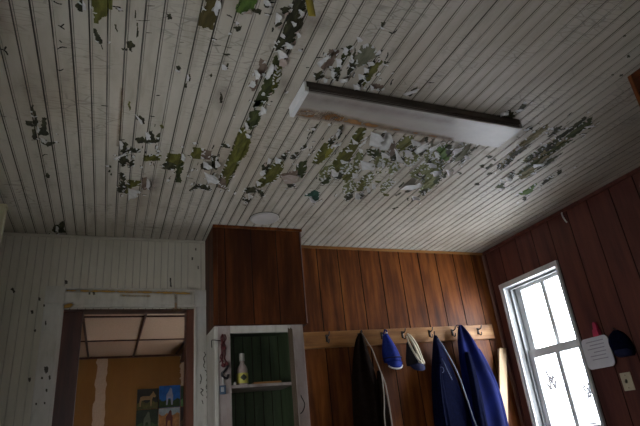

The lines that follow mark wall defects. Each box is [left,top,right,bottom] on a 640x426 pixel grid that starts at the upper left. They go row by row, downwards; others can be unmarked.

peeling [75,0,123,50]
peeling [25,104,59,147]
peeling [105,0,478,206]
peeling [479,111,599,203]